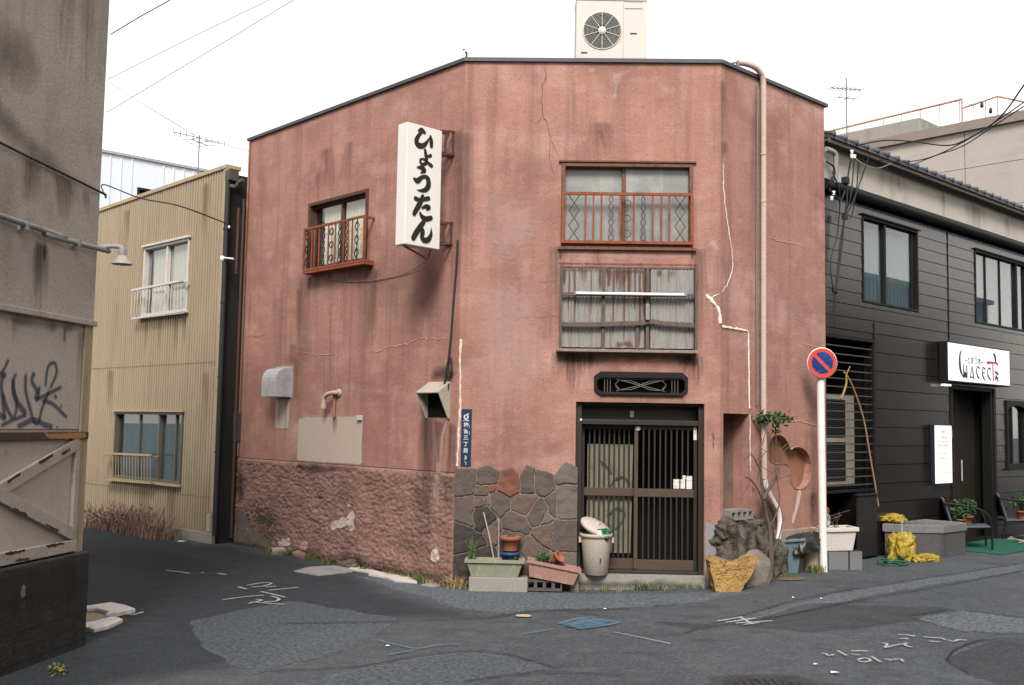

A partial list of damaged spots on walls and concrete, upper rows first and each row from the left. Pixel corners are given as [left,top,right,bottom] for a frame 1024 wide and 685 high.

crack [537,65,561,173]
rust [560,253,661,346]
flaking render [326,504,355,531]